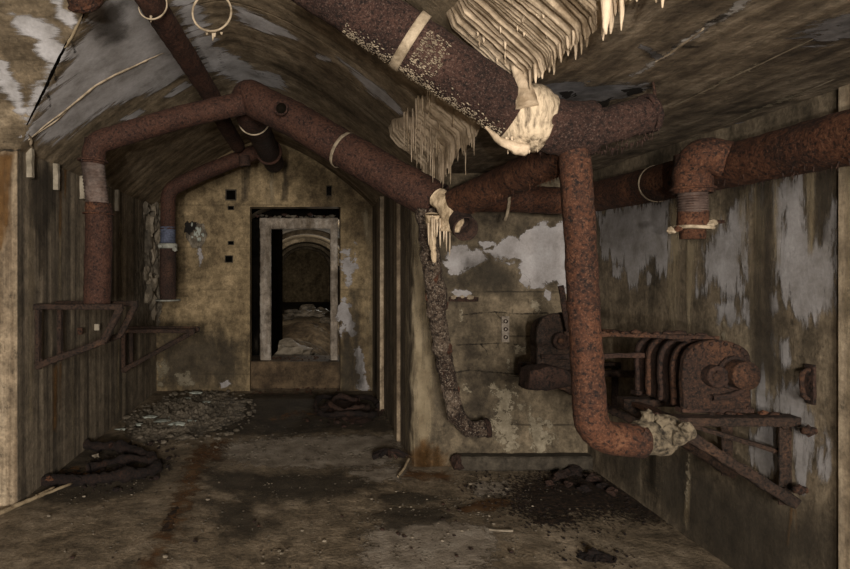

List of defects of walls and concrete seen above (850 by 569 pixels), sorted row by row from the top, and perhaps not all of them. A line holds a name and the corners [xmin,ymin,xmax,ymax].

spalling [184,221,207,264]
peeling [339,241,359,287]
peeling [443,221,567,313]
peeling [596,199,673,290]
peeling [695,174,838,329]
peeling [336,297,356,337]
peeling [354,346,370,391]
peeling [772,338,791,368]
peeling [749,371,832,495]